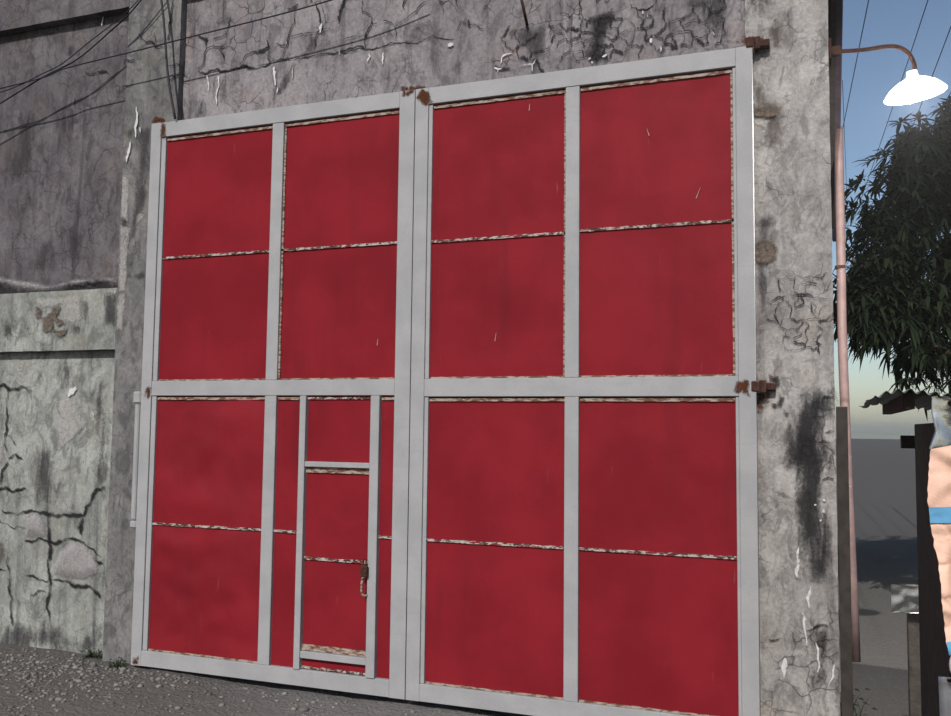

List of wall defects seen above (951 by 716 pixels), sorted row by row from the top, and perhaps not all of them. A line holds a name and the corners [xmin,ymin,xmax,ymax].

crack [85,0,726,97]
crack [765,272,833,354]
crack [0,383,105,625]
leakage [786,392,835,686]
flaking render [763,586,790,690]